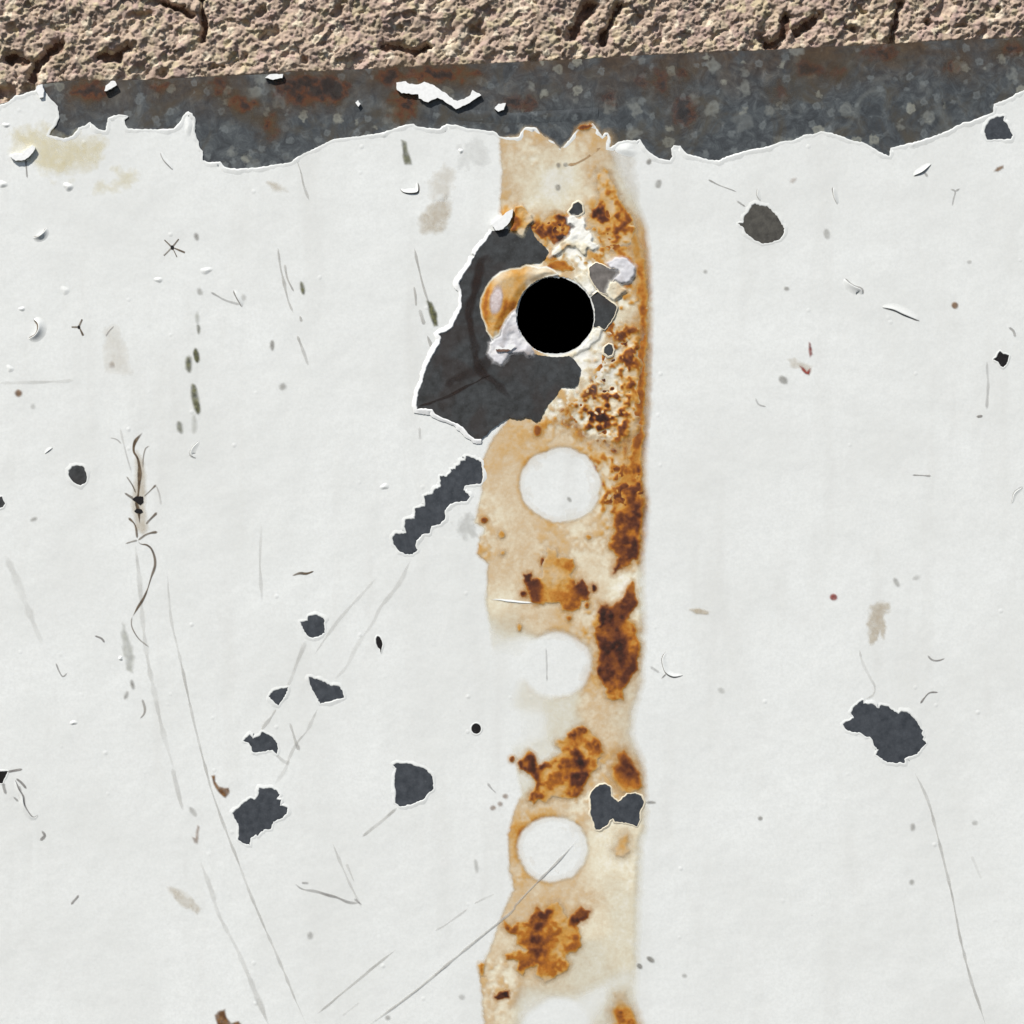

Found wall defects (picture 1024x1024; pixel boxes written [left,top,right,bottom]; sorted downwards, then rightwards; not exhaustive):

peeling [0,38,1024,175]
peeling [736,200,788,246]
peeling [389,200,635,557]
crack [126,436,157,636]
rust [475,123,649,1024]
peeling [298,611,329,641]
peeling [304,674,347,706]
peeling [241,730,281,757]
peeling [840,698,928,767]
peeling [228,784,292,848]
peeling [389,760,436,810]
peeling [588,782,646,832]